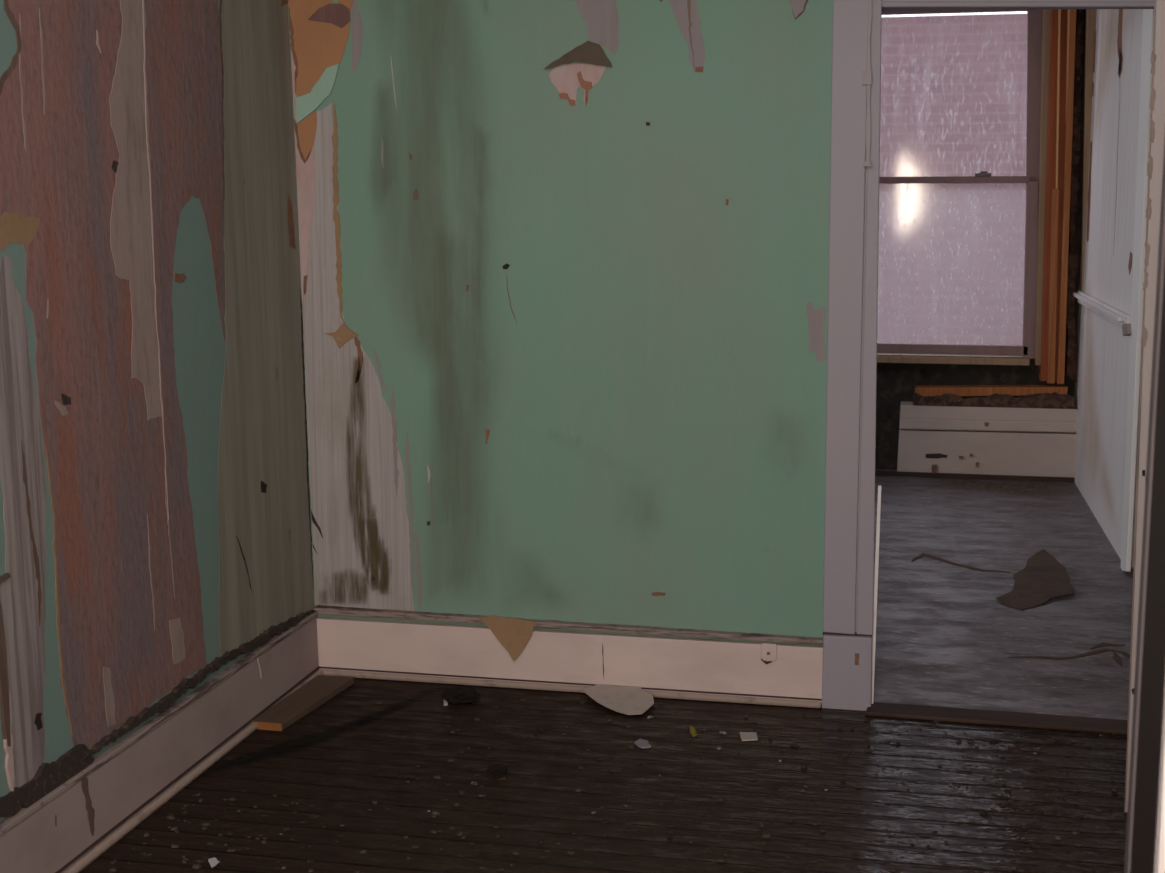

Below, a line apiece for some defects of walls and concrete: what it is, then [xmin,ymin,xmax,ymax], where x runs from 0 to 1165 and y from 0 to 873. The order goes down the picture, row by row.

peeling [549,0,619,106]
peeling [660,0,705,72]
peeling [0,0,421,791]
leakage [335,360,387,602]